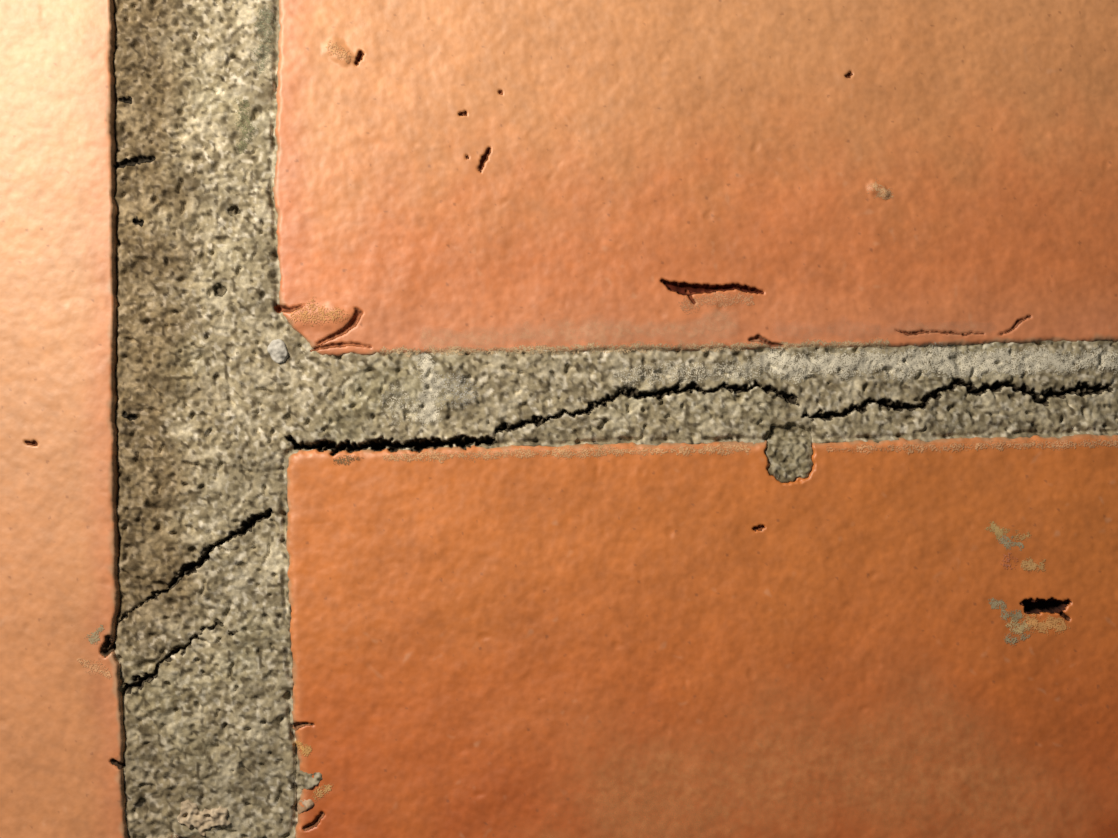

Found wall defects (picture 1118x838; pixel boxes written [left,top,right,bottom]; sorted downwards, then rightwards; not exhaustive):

spalling [274,296,372,352]
crack [896,315,1031,336]
crack [285,378,1113,456]
crack [120,508,273,621]
spalling [985,521,1046,572]
spalling [989,598,1071,645]
crack [123,619,238,695]